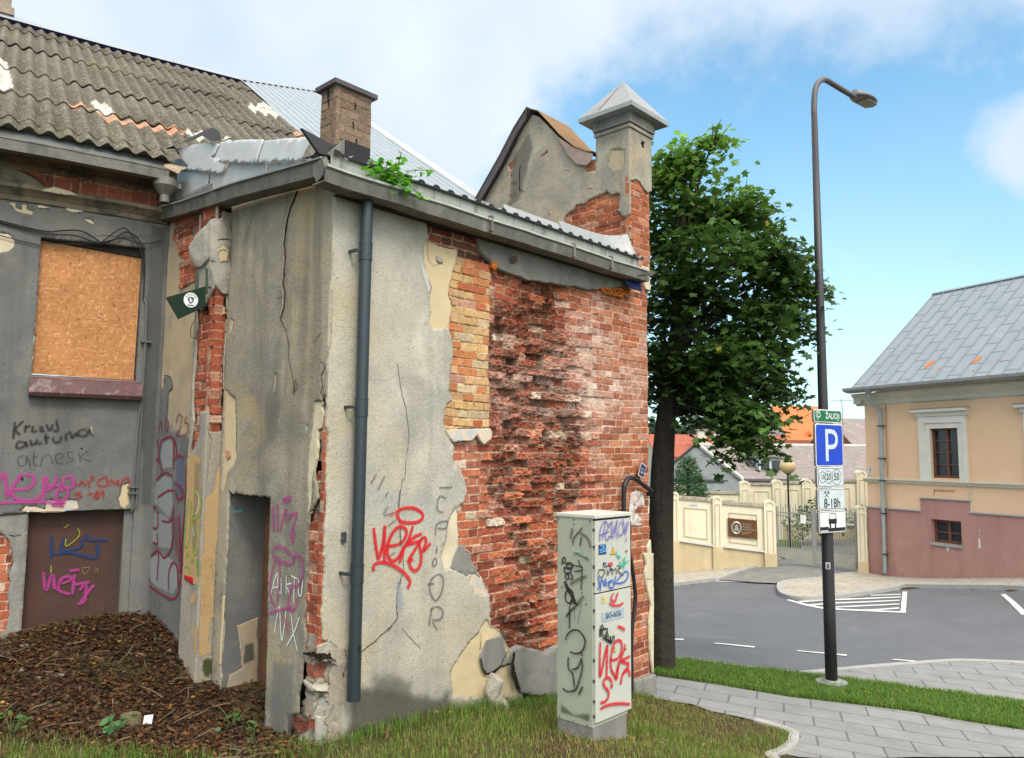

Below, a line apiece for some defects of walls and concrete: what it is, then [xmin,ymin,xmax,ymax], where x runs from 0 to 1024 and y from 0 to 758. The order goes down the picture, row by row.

flaking render [18,168,161,207]
peeling [161,213,201,436]
crack [278,191,327,407]
spalling [564,185,626,236]
flaking render [0,500,79,640]
peeling [183,390,237,665]
spalling [290,401,348,744]
crack [362,368,421,652]
spalling [424,225,654,698]